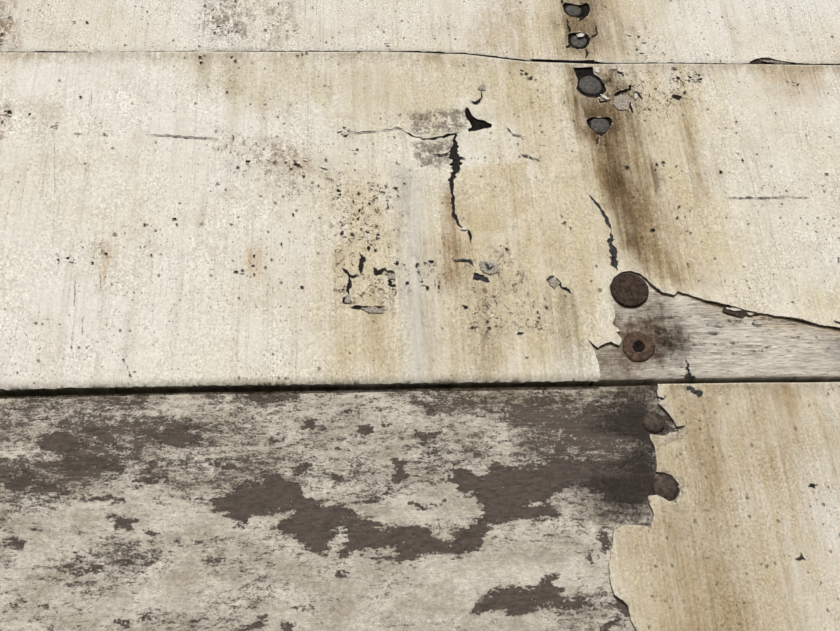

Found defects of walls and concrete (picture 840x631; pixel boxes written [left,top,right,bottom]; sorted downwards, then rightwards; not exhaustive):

crack [351,84,500,283]
crack [590,197,618,270]
rust [625,319,680,358]
peeling [355,409,392,442]
peeling [35,426,180,490]
peeling [3,469,161,538]
peeling [194,429,687,564]
peeling [3,523,42,551]
peeling [60,552,103,577]
peeling [235,614,268,631]
peeling [469,572,597,616]
peeling [599,599,629,631]